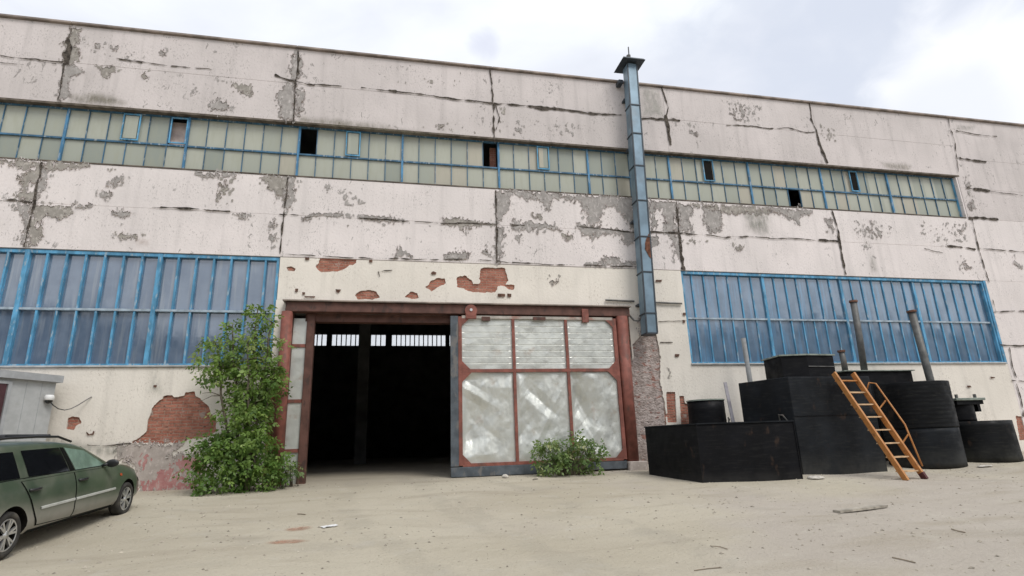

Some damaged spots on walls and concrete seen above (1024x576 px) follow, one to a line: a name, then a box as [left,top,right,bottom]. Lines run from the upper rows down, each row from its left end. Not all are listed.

crack [0,28,72,100]
peeling [274,49,310,123]
crack [274,51,680,145]
crack [726,103,828,163]
peeling [0,156,146,247]
flaking render [305,257,356,272]
crack [279,177,635,277]
peeling [405,188,637,299]
crack [580,201,847,275]
peeling [648,197,813,263]
flaking render [630,317,689,462]
flaking render [113,385,216,491]